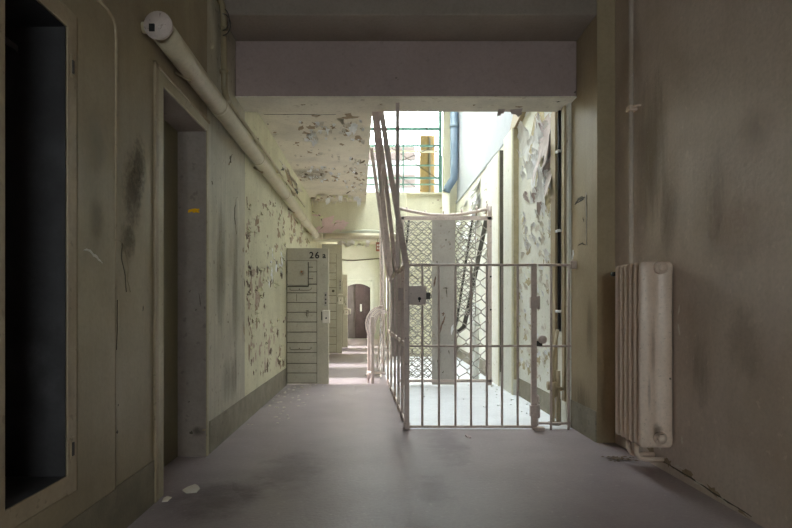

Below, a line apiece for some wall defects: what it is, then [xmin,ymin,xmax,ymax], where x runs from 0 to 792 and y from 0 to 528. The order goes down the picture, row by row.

peeling [243,197,310,375]
peeling [279,113,370,248]
peeling [497,106,552,381]